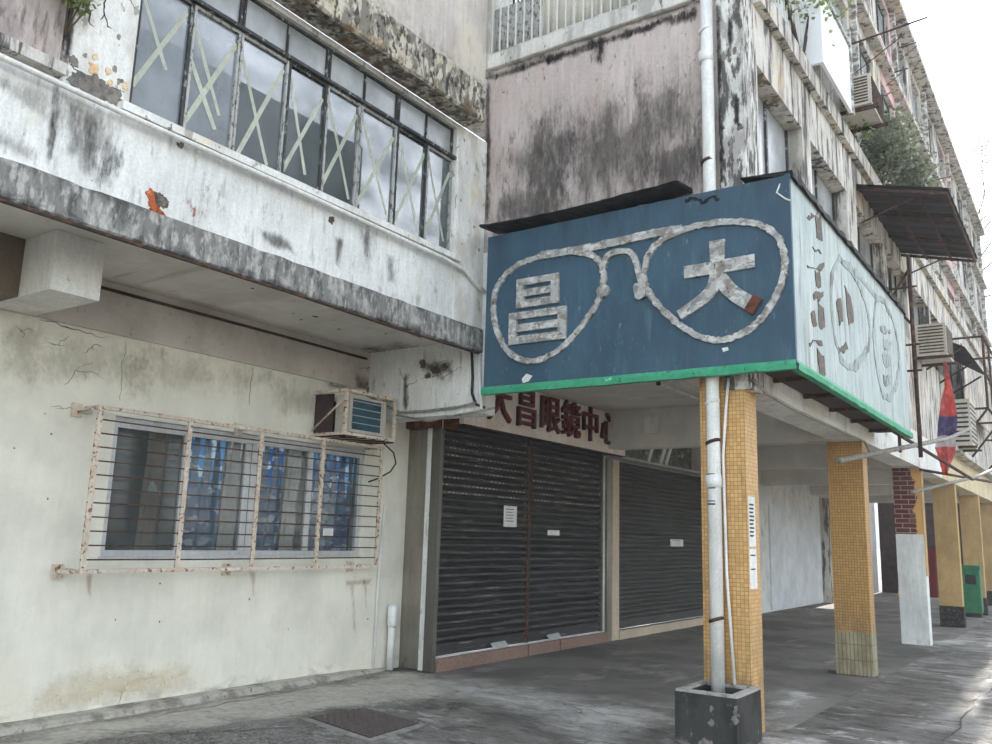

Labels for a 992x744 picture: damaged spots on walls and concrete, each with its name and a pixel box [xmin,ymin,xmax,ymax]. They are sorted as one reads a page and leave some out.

damp [60,0,74,62]
damp [48,88,58,156]
damp [70,106,109,165]
peeling [66,53,128,106]
damp [486,8,696,178]
damp [487,75,700,222]
damp [716,5,732,180]
flaking render [145,188,169,216]
damp [264,233,290,249]
crack [16,320,126,415]
crack [942,688,992,744]